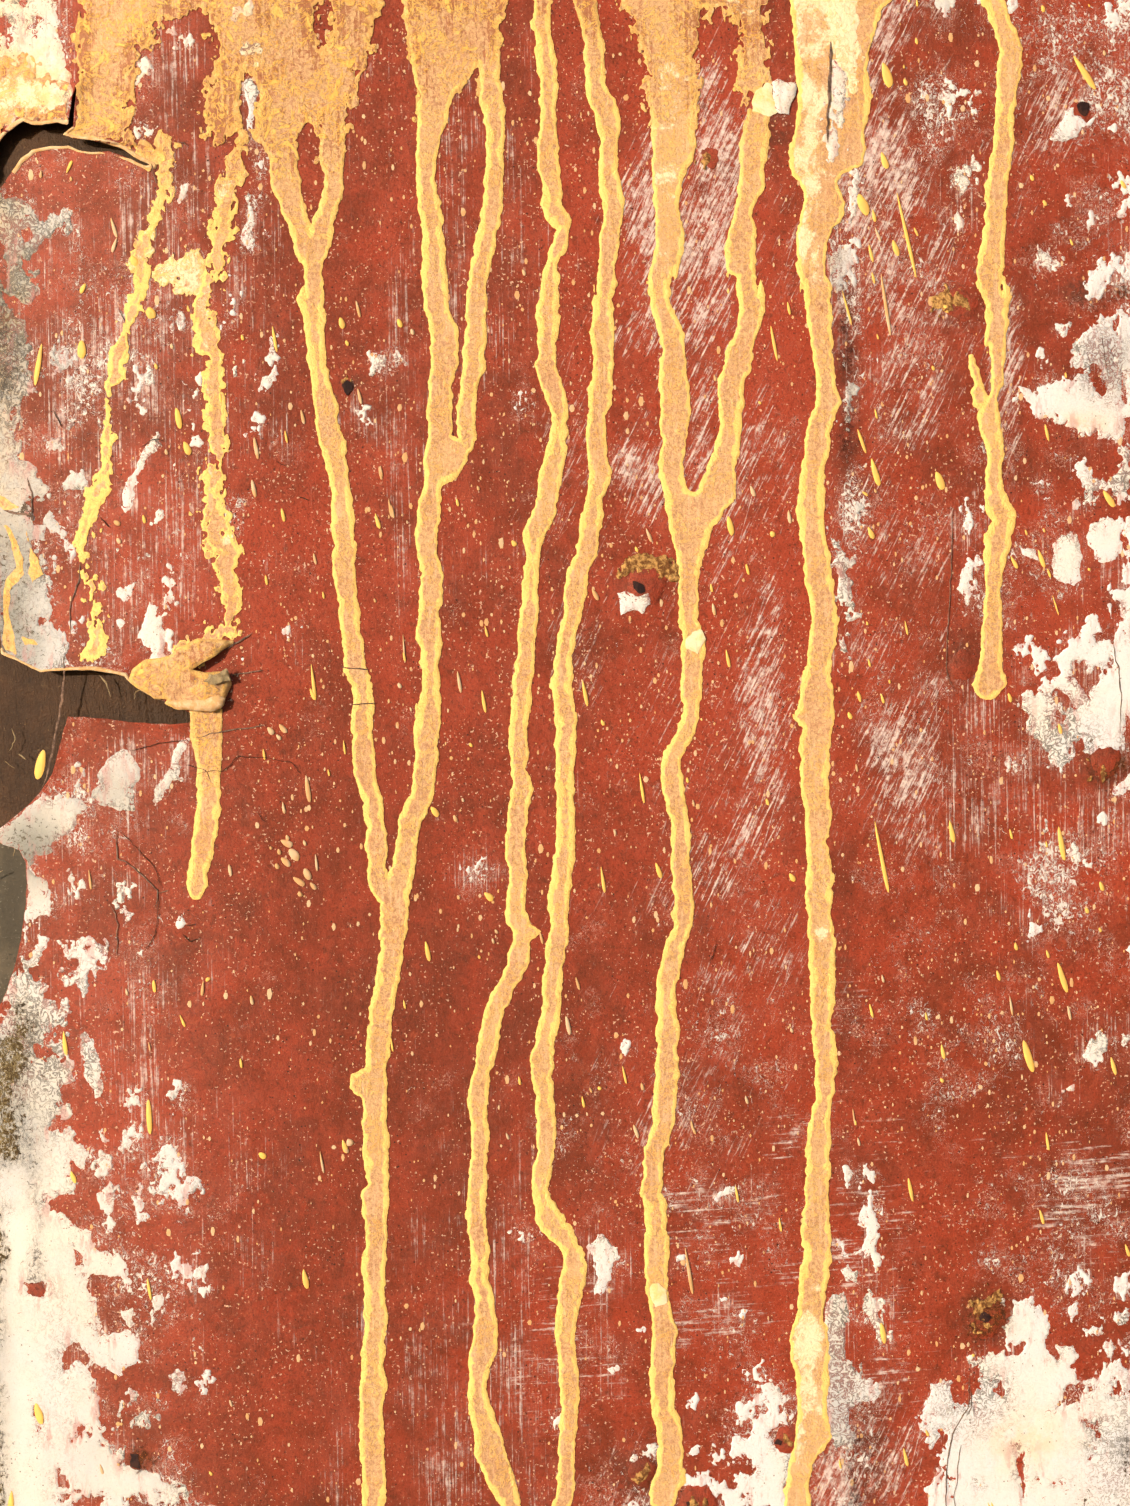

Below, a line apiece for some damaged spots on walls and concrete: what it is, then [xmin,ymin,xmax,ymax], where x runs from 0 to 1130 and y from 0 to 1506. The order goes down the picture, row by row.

peeling [0,0,73,126]
peeling [938,77,982,141]
peeling [1049,101,1123,142]
peeling [232,333,281,392]
peeling [0,186,88,670]
peeling [121,432,162,513]
peeling [116,548,182,659]
peeling [957,497,985,605]
peeling [1012,243,1130,773]
peeling [0,738,217,1506]
crack [945,1376,972,1504]
peeling [914,1265,1130,1506]